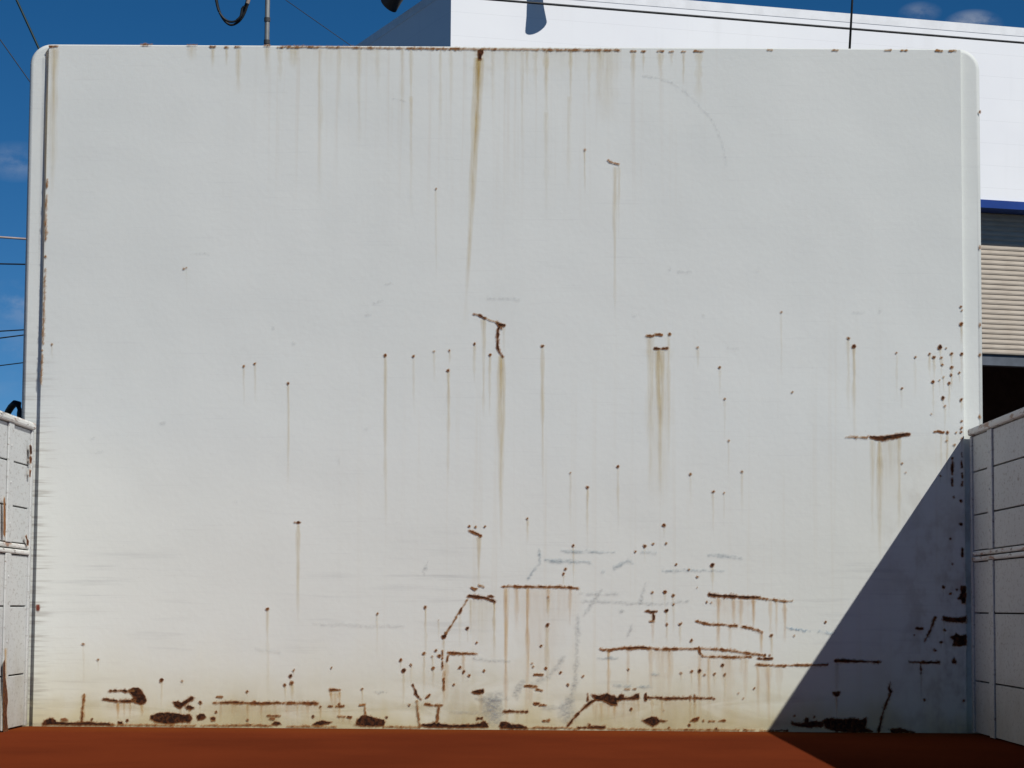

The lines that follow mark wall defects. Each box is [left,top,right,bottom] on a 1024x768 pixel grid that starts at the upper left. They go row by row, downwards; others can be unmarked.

rust [915,344,963,407]
rust [940,420,963,503]
rust [933,585,967,652]
rust [103,687,147,707]
rust [42,694,336,728]
rust [356,703,577,730]
rust [609,715,873,733]